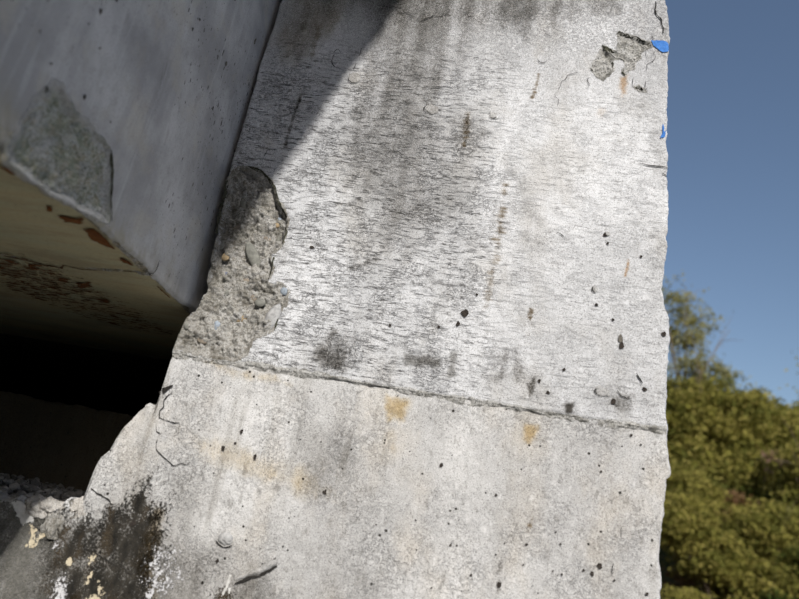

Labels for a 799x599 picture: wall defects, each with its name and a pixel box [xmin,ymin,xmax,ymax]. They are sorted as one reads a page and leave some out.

spalling [590,31,652,82]
spalling [0,77,290,362]
crack [156,385,189,466]
leakage [0,472,191,599]